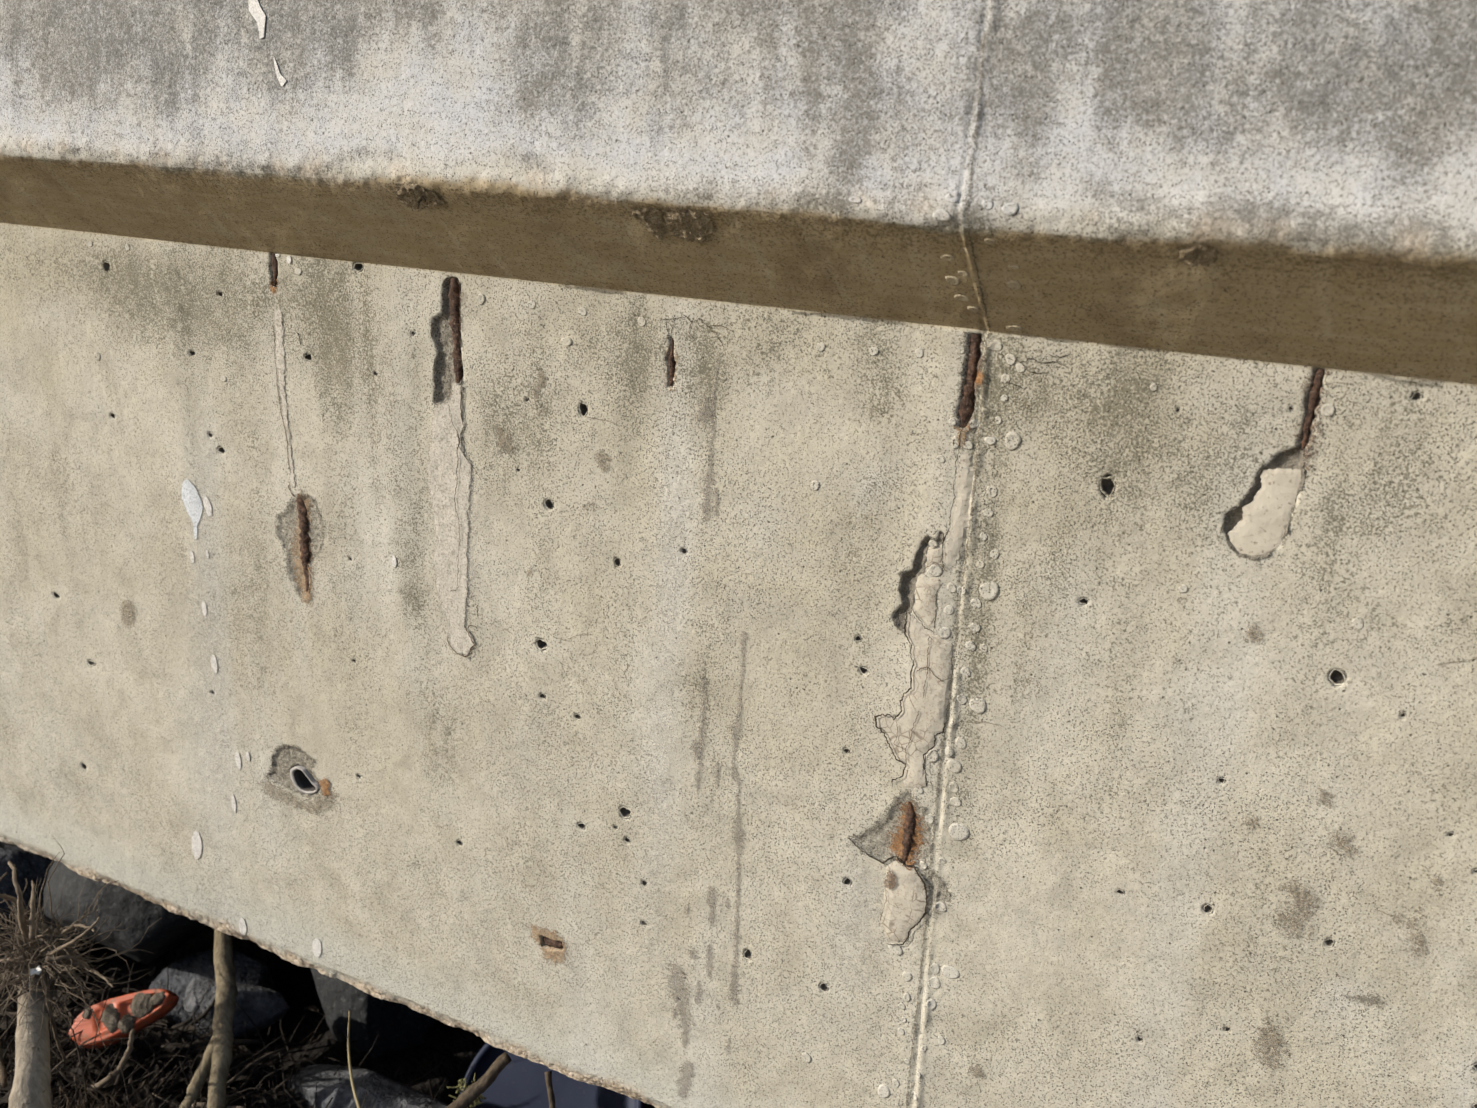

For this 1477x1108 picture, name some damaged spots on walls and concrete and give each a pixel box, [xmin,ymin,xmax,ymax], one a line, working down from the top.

crack [273,308,301,496]
spalling [425,276,479,657]
corrosion [663,338,678,391]
corrosion [954,332,986,447]
spalling [1220,367,1331,560]
spalling [258,779,344,816]
spalling [848,531,956,945]
corrosion [529,924,570,964]